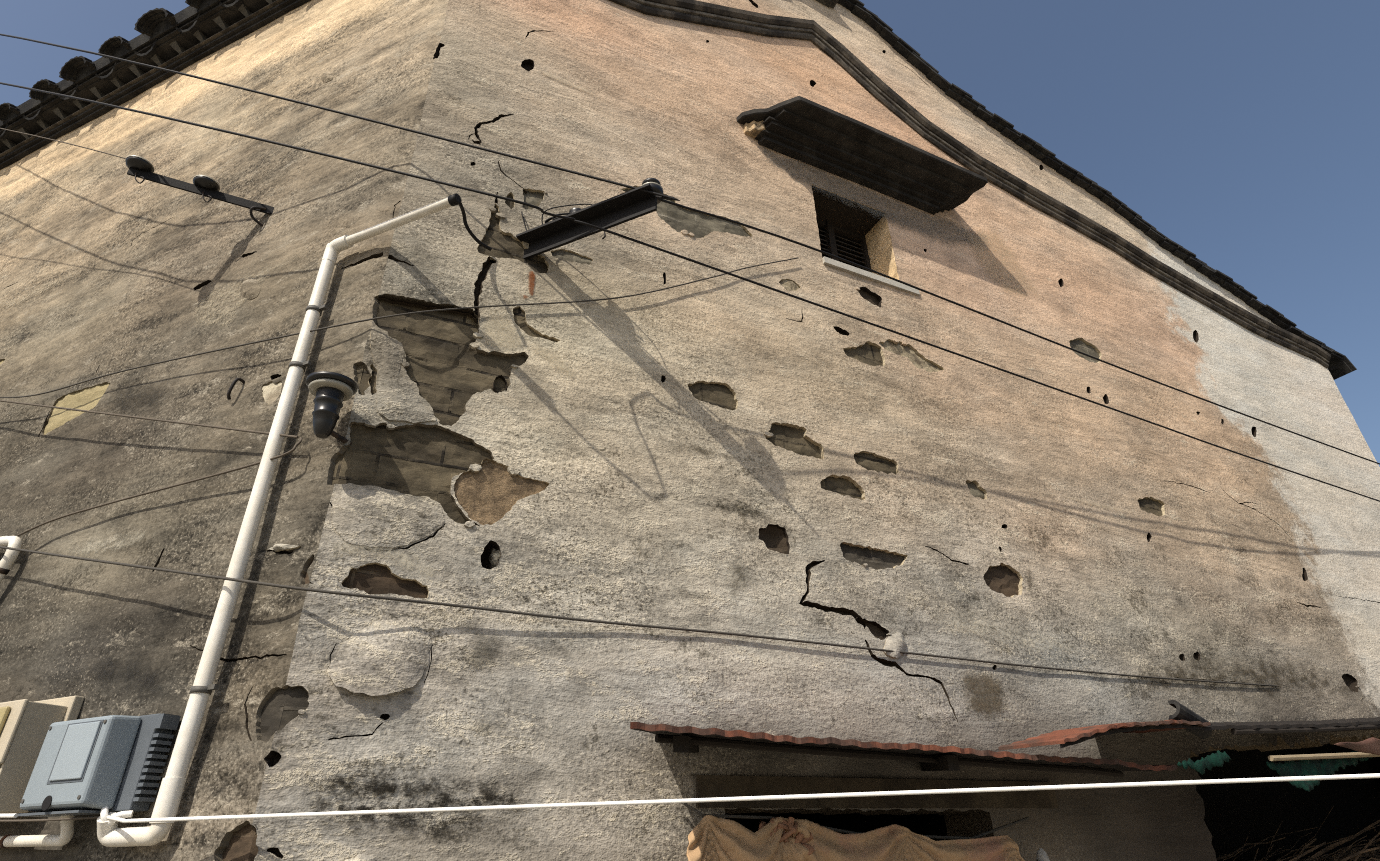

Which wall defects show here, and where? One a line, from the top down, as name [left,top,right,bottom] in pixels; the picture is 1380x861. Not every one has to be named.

crack [468,114,527,204]
crack [342,252,414,269]
crack [378,256,496,324]
flaking render [327,293,550,528]
peeling [687,381,738,410]
peeling [764,422,824,459]
peeling [820,451,899,500]
flaking render [341,562,429,598]
peeling [840,542,907,570]
peeling [983,547,1023,597]
crack [799,560,958,722]
peeling [255,685,309,767]